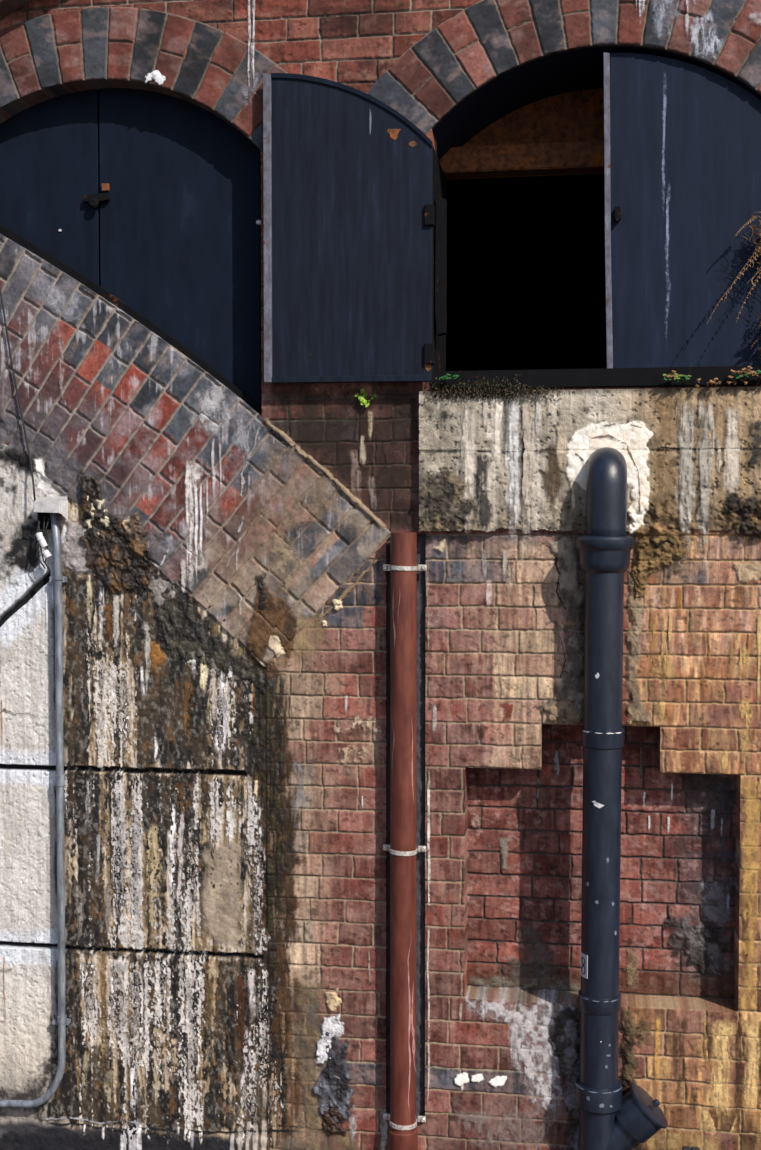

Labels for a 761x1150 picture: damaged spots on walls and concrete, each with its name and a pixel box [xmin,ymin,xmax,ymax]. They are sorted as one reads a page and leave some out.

damp [242,0,258,96]
damp [636,0,672,36]
damp [685,0,721,55]
damp [45,286,78,319]
damp [442,395,575,588]
damp [482,550,492,605]
damp [335,696,382,732]
damp [0,388,304,1150]
damp [338,745,370,763]
spalling [313,988,354,1137]
damp [459,988,575,1144]